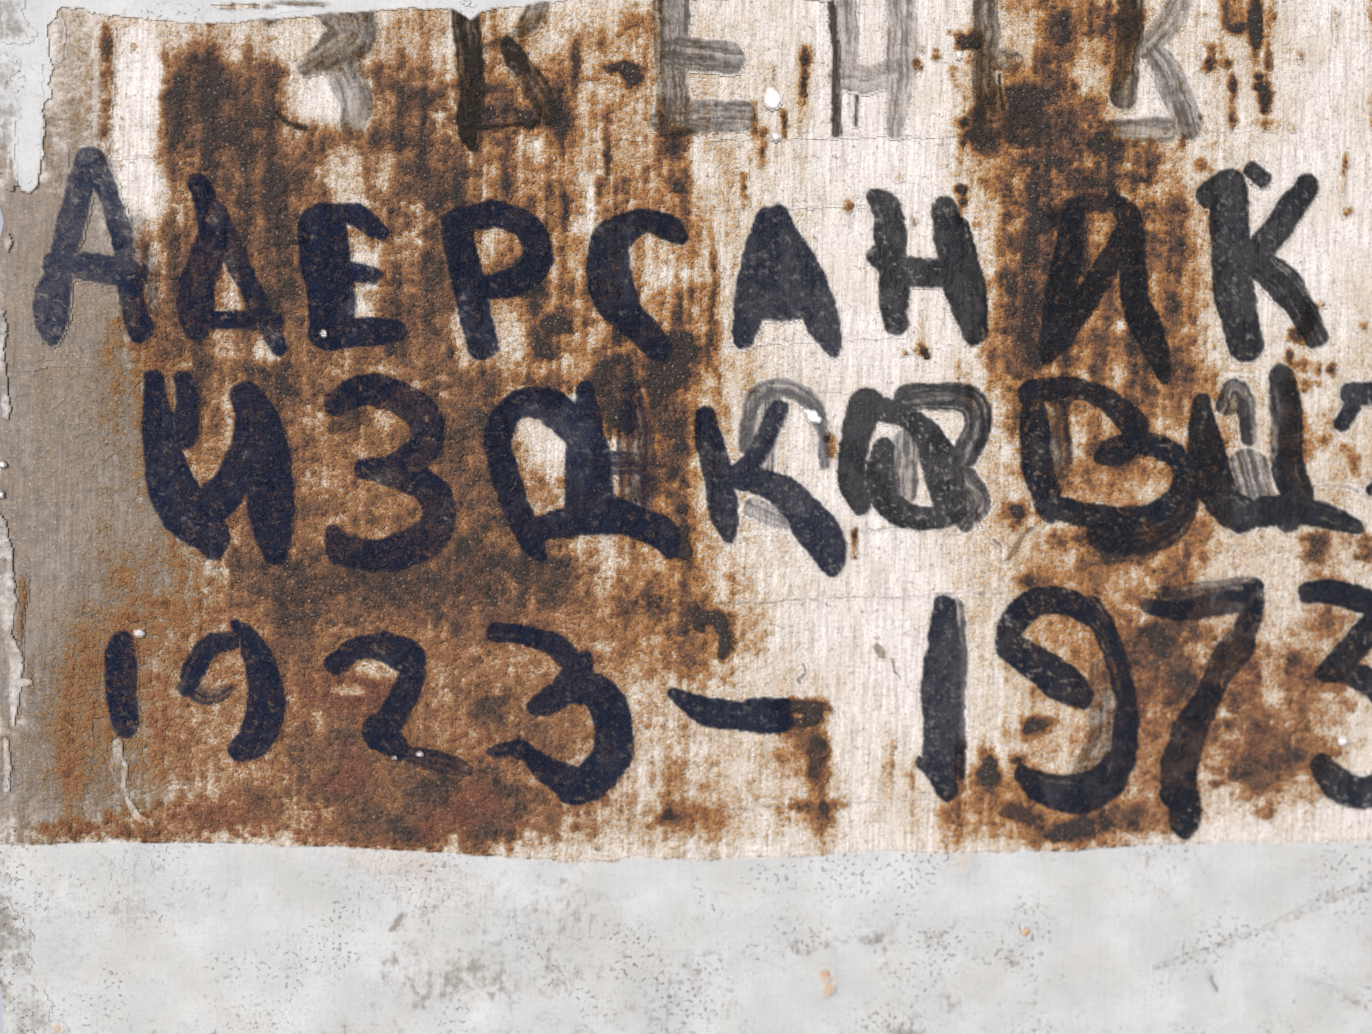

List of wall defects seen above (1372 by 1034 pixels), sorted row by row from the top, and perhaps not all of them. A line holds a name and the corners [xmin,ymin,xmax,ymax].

corrosion [0,0,900,863]
corrosion [899,312,934,370]
corrosion [905,0,1372,853]